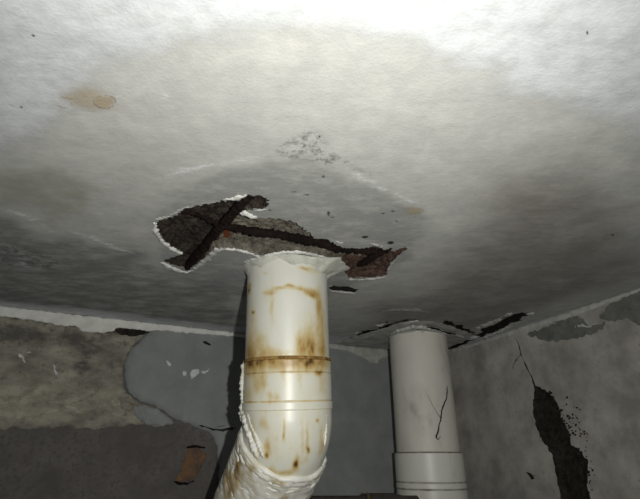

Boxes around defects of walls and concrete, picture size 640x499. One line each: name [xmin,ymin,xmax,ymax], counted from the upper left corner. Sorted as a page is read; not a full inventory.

damp [0,29,640,336]
spalling [151,194,408,294]
spalling [0,306,246,430]
crack [351,312,537,386]
peeling [451,288,640,352]
spalling [533,386,595,499]